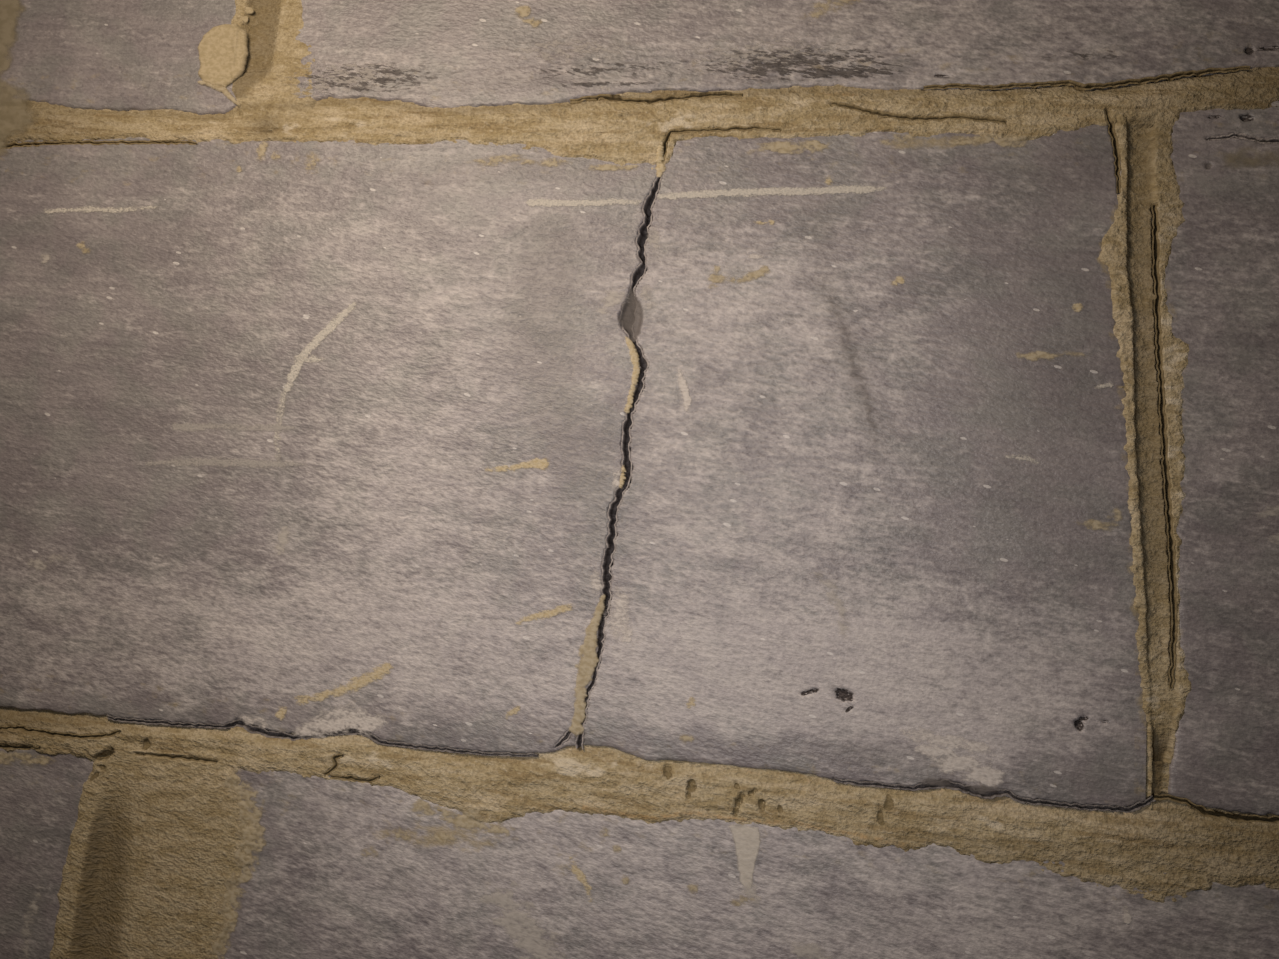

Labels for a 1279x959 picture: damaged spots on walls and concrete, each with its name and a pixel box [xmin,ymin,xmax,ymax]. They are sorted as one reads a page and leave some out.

crack [554,125,781,750]